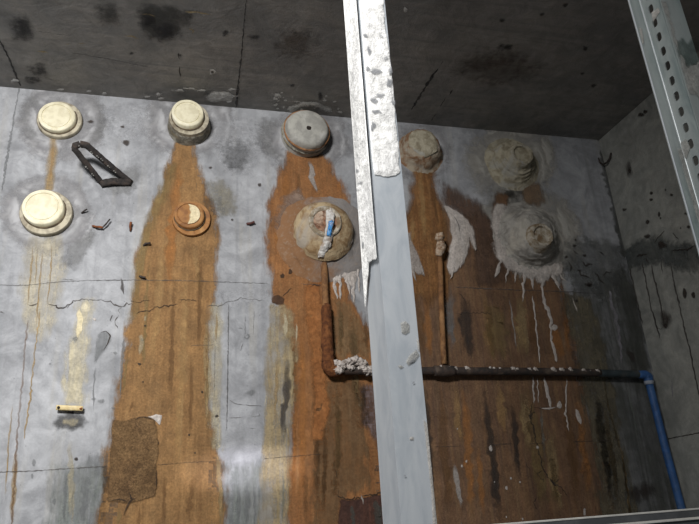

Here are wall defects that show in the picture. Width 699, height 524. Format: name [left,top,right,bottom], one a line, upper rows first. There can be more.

water stain [140,6,191,38]
rust [46,139,56,190]
rust [24,240,59,438]
crack [30,297,261,328]
rust [96,142,228,524]
rust [264,110,381,524]
water stain [333,269,360,302]
water stain [444,206,476,279]
rust [406,171,638,524]
water stain [491,204,582,430]
rust [6,425,17,508]
spalling [108,414,162,514]